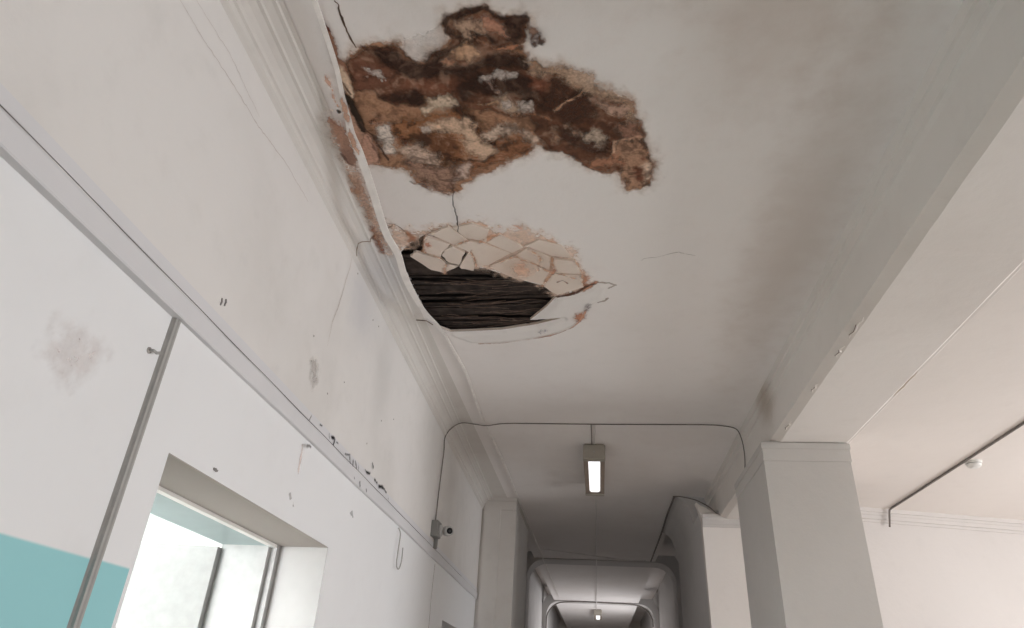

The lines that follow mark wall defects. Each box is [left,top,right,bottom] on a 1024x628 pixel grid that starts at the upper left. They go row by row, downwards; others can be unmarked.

crack [334,0,356,48]
flaking render [325,24,389,165]
flaking render [401,222,584,332]